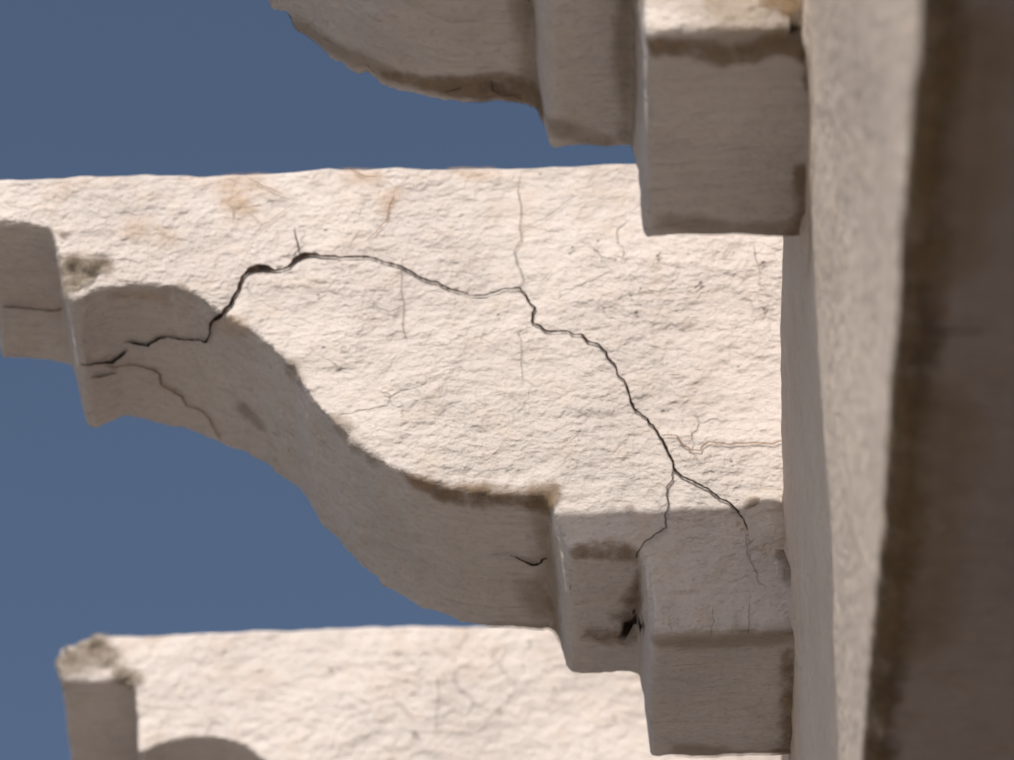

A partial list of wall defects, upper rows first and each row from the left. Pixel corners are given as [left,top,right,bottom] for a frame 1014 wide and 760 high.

damp [648,30,806,64]
damp [794,167,810,266]
crack [80,169,782,558]
damp [407,476,555,514]
crack [511,555,547,566]
spalling [55,634,142,691]